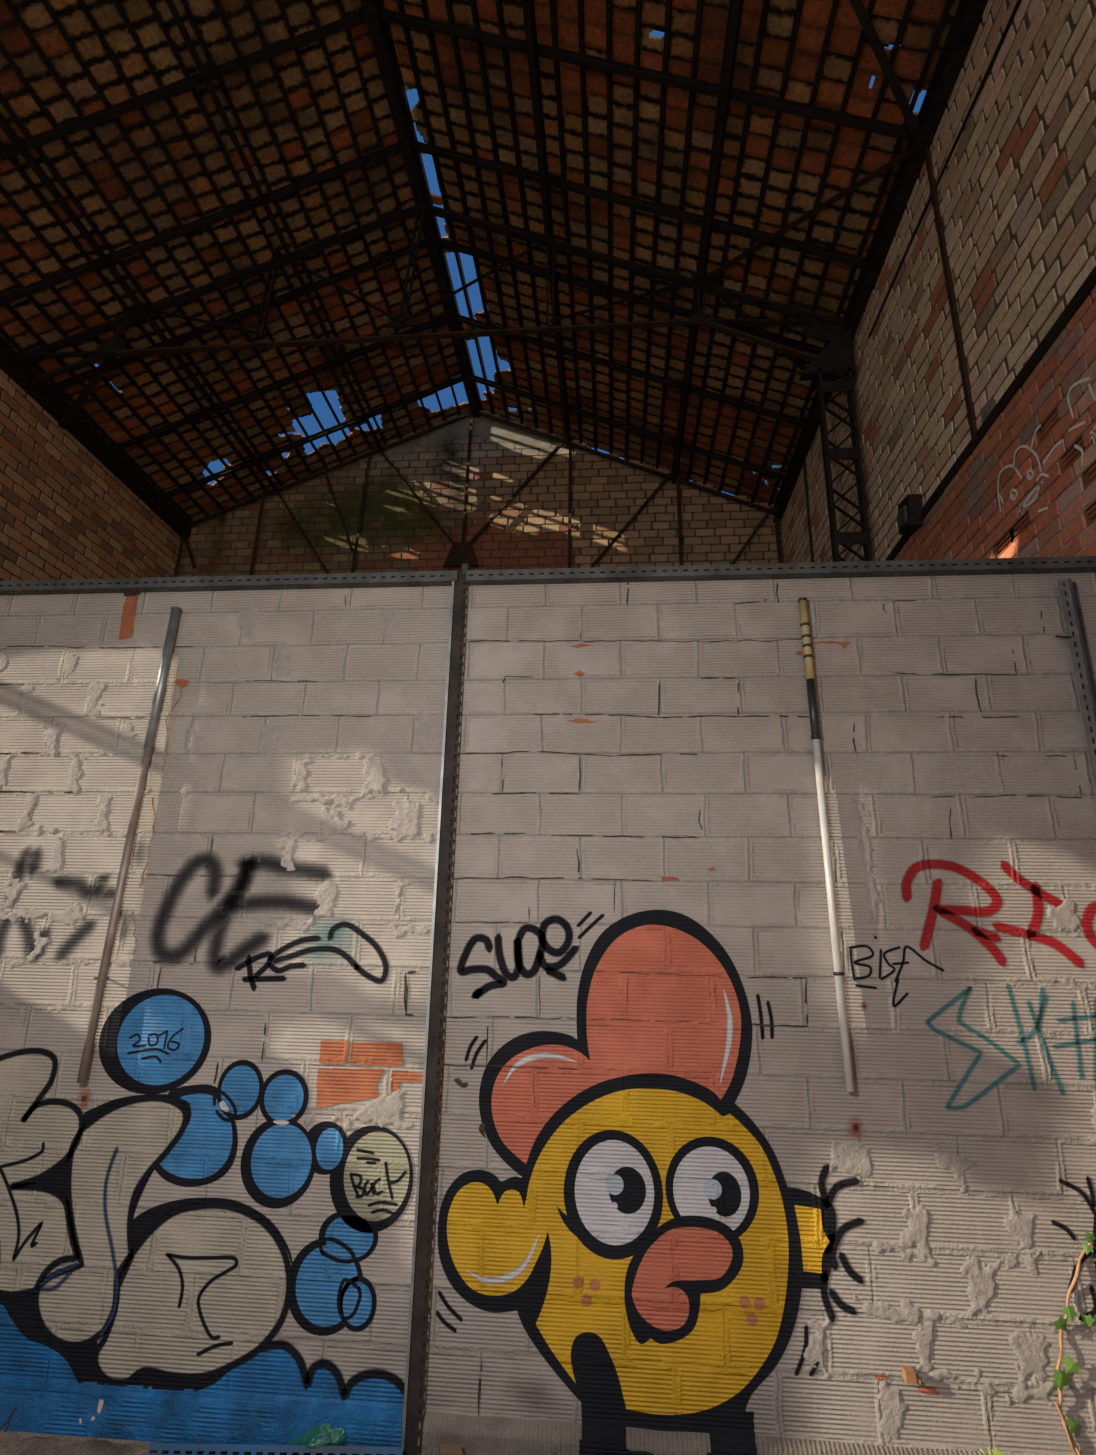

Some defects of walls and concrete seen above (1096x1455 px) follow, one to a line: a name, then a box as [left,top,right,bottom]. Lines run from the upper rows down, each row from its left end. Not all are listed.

peeling [316,1040,423,1108]
peeling [436,1040,468,1172]
peeling [917,1387,939,1395]